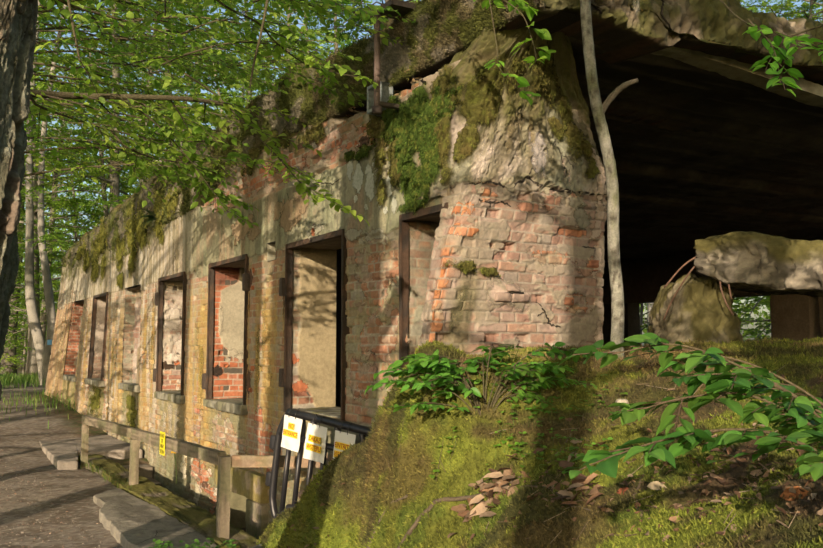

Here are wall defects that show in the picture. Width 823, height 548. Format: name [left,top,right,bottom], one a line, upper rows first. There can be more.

flaking render [242,124,397,214]
crack [464,131,607,214]
damp [529,132,546,175]
flaking render [273,192,309,232]
spalling [517,142,606,279]
flaking render [162,308,182,370]
flaking render [212,349,243,376]
spalling [344,228,410,401]
crack [536,302,561,327]
flaking render [594,319,602,342]
spalling [187,395,274,460]
spalling [180,455,217,515]